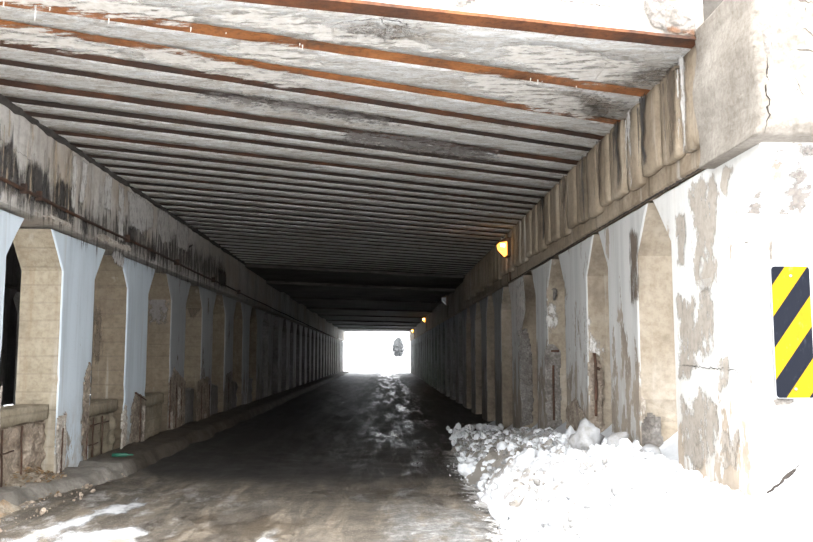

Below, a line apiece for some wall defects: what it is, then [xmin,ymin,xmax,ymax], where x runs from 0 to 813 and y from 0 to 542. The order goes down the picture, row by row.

damp [0,0,196,27]
damp [0,25,326,88]
damp [205,5,467,58]
spalling [645,0,696,35]
damp [197,91,503,164]
crack [764,58,772,129]
damp [0,109,226,290]
peeling [779,145,813,215]
peeling [675,165,733,379]
peeling [770,240,801,266]
spalling [641,396,663,447]
peeling [680,355,739,469]